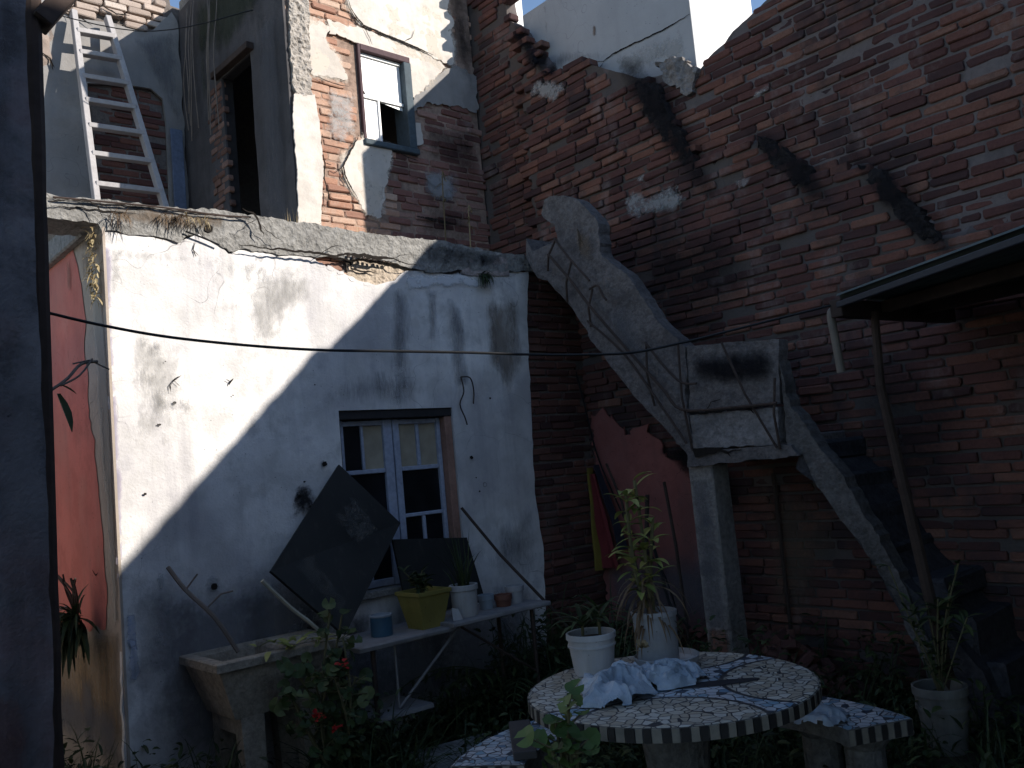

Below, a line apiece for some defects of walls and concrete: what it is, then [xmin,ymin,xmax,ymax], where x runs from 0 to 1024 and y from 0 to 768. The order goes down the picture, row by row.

crack [597,14,689,67]
damp [696,354,767,380]
damp [295,487,314,514]